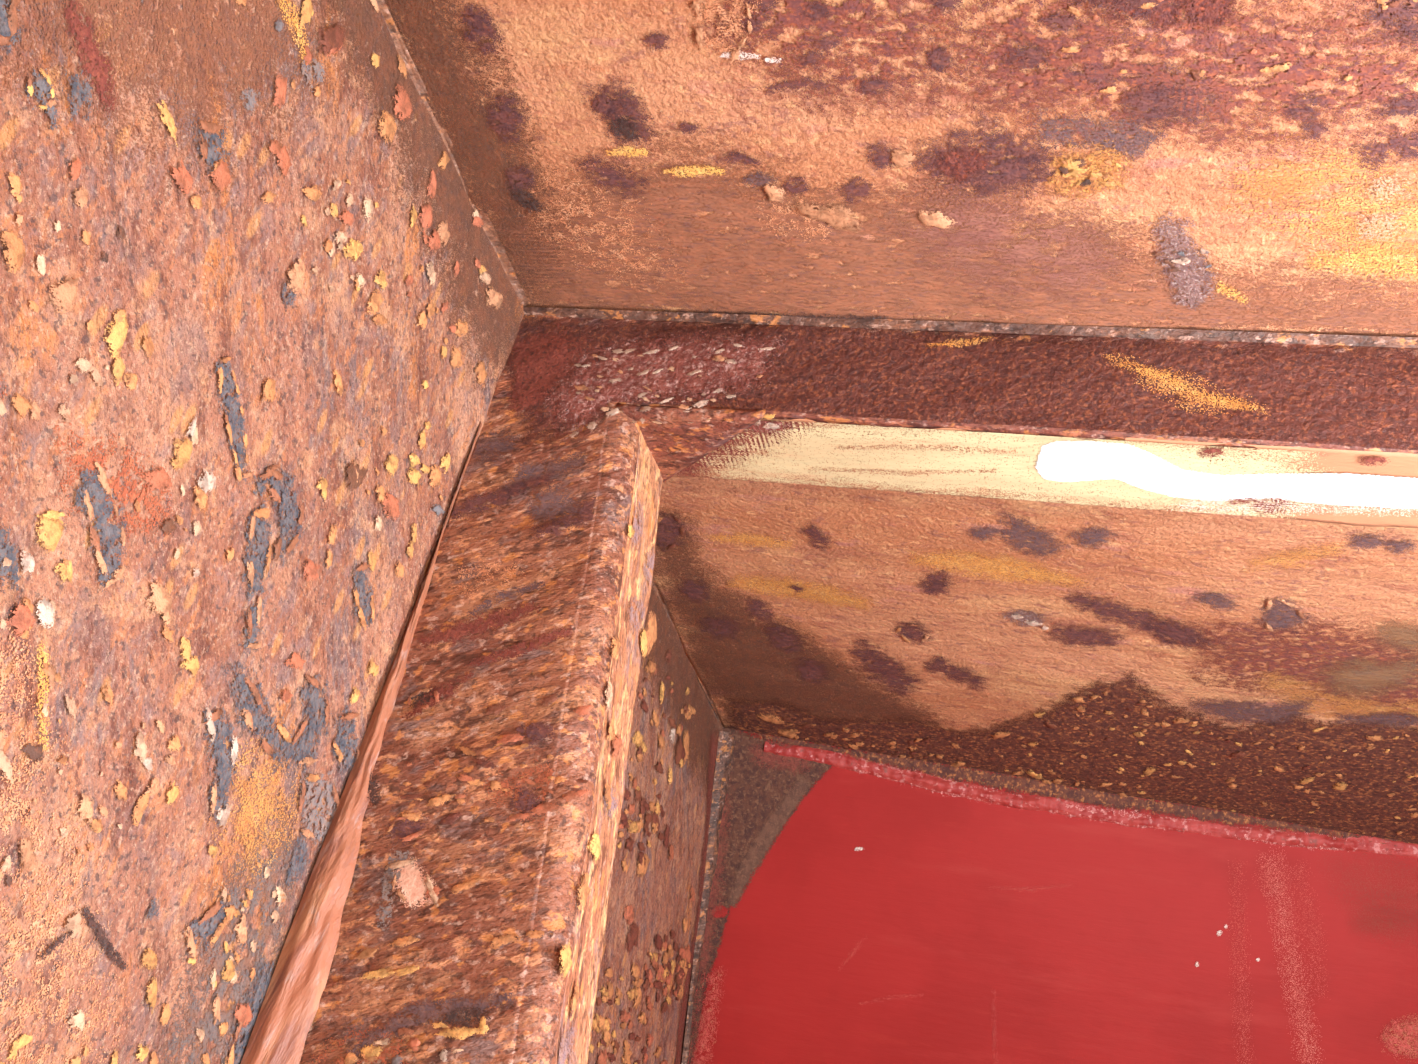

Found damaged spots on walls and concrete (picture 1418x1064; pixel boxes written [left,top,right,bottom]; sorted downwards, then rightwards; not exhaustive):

corrosion [0,0,1418,584]
corrosion [0,593,306,1064]
corrosion [145,577,200,676]
corrosion [308,988,516,1064]
corrosion [354,848,485,980]
corrosion [400,501,1418,1064]